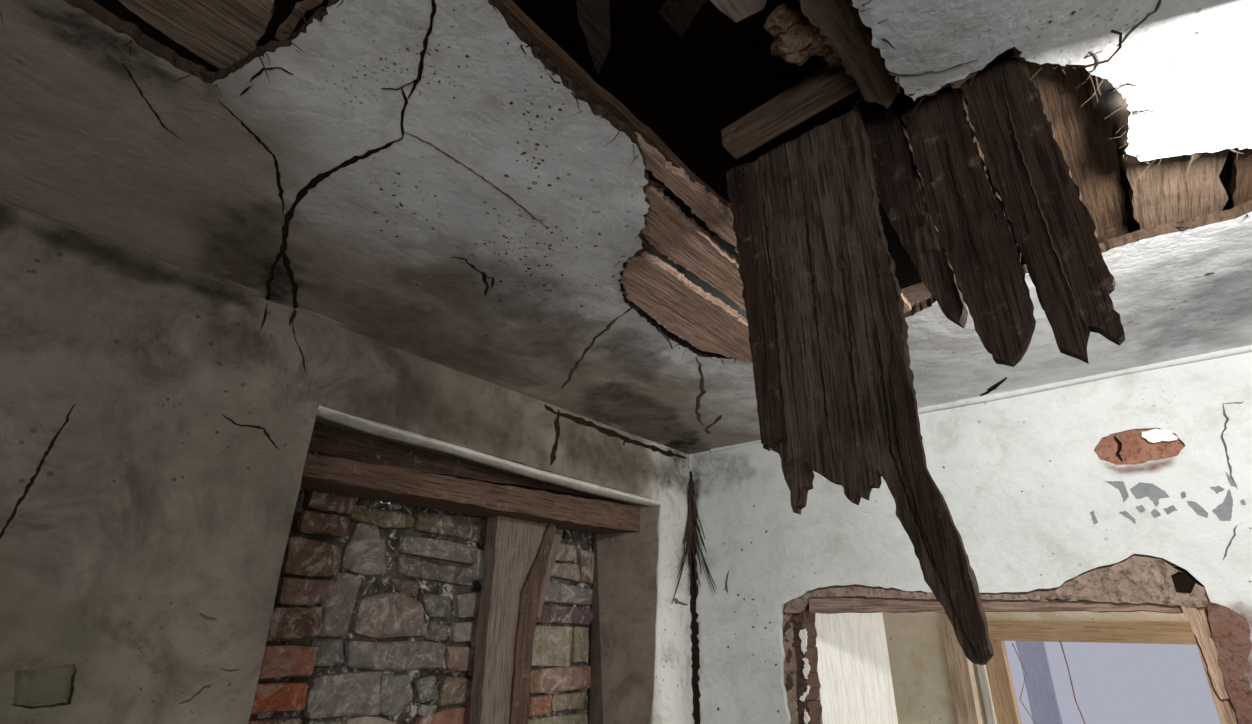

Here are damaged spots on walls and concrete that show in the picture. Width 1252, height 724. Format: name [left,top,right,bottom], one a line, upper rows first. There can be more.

damp [343,41,470,101]
crack [219,0,547,374]
damp [505,90,564,189]
damp [440,208,601,329]
crack [0,404,75,539]
crack [223,415,279,449]
crack [544,307,729,724]
flaking render [1094,429,1246,524]
crack [1223,526,1237,559]
crack [1221,402,1243,489]
flaking render [783,586,937,724]
flaking render [980,556,1252,724]